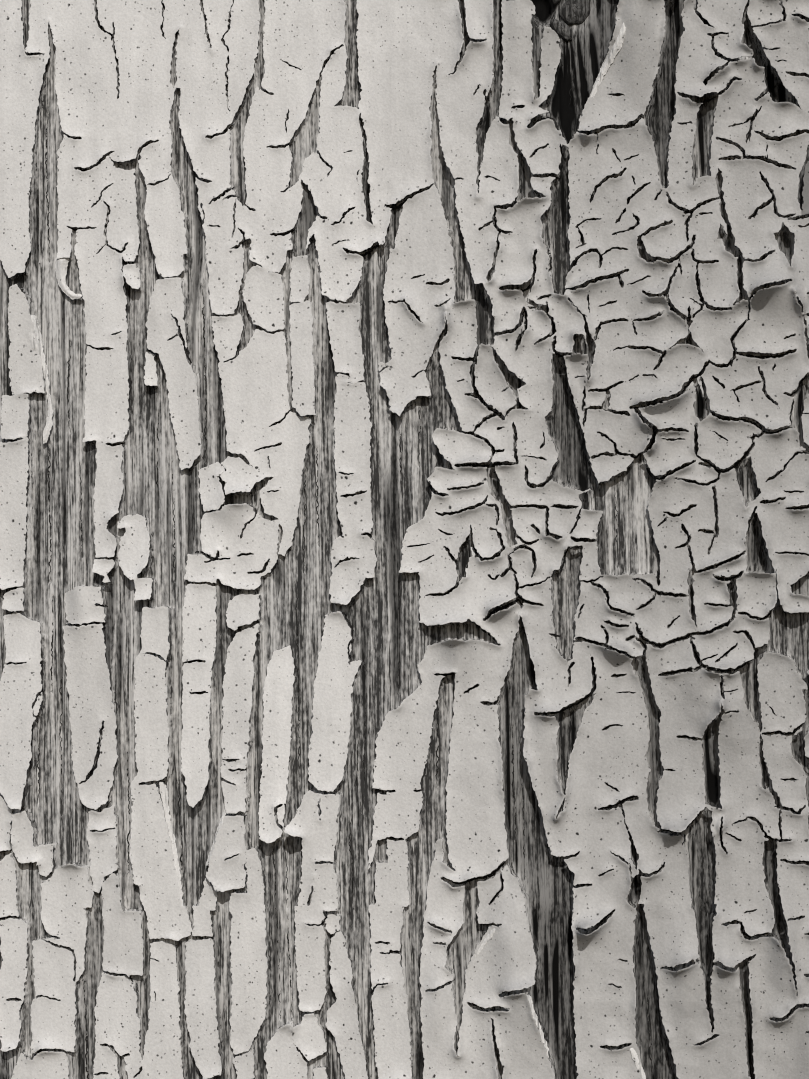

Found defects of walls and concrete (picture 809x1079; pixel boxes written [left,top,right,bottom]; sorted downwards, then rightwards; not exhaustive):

crack [96,0,120,93]
peeling [0,284,268,1079]
peeling [258,611,368,1079]
peeling [0,0,809,605]
crack [442,727,526,925]
peeling [368,176,751,1079]
crack [399,118,809,714]
crack [599,783,637,809]
peeling [574,382,809,669]
crack [575,805,809,886]
peeling [646,638,809,1079]
crack [764,706,809,780]